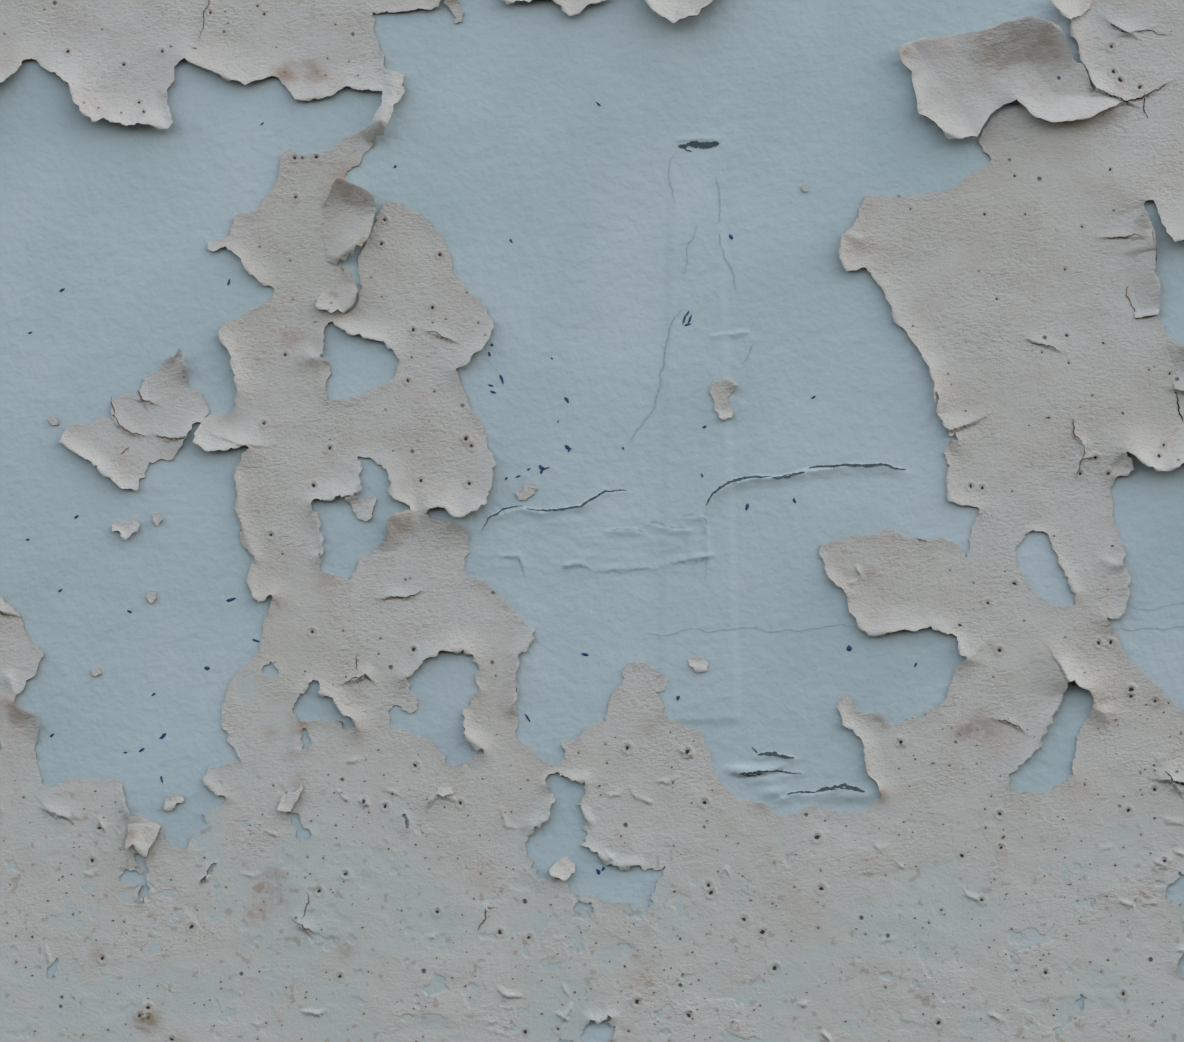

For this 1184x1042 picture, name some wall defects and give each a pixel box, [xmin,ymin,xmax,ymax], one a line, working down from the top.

peeling [1116,167,1184,391]
peeling [290,0,1123,816]
peeling [0,36,385,902]
crack [705,463,906,506]
crack [482,489,627,530]
crack [565,555,710,581]
peeling [1096,424,1184,711]
crack [647,624,852,636]
crack [740,747,865,795]
peeling [525,773,665,913]
peeling [1165,872,1184,906]